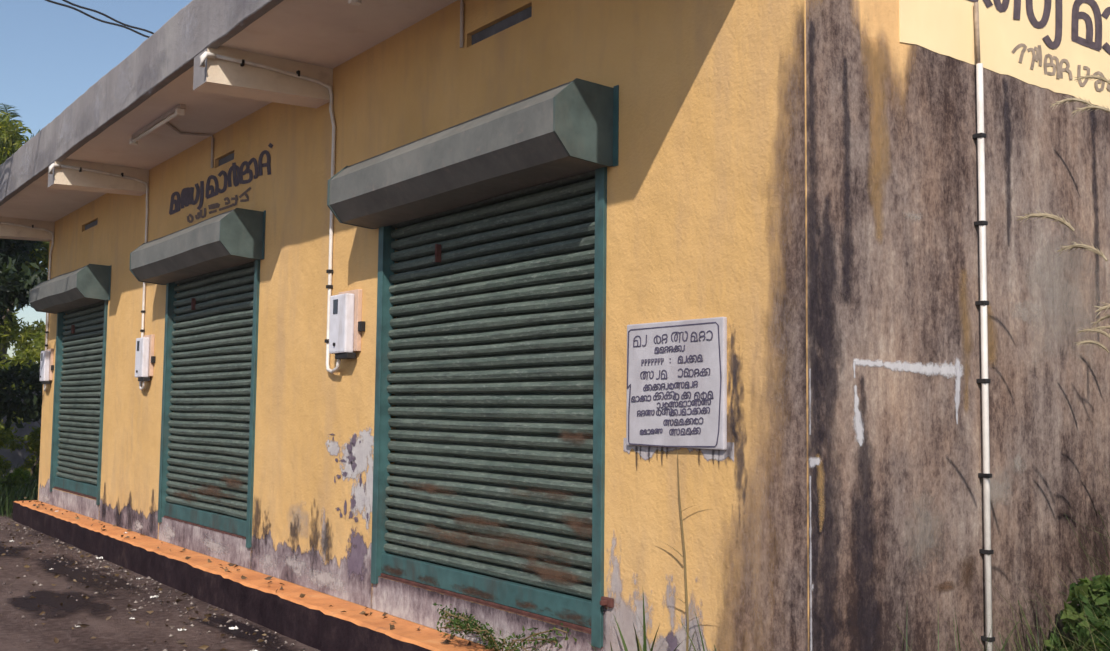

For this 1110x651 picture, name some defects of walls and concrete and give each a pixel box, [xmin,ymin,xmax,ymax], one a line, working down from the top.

spalling [39,428,709,651]
damp [719,0,1110,651]